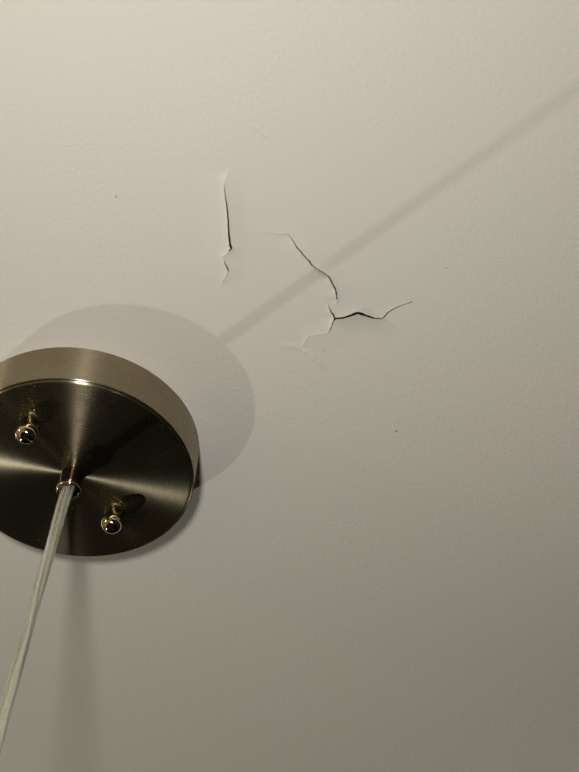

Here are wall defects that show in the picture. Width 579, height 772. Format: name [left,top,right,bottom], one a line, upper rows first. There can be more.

crack [194,162,413,354]